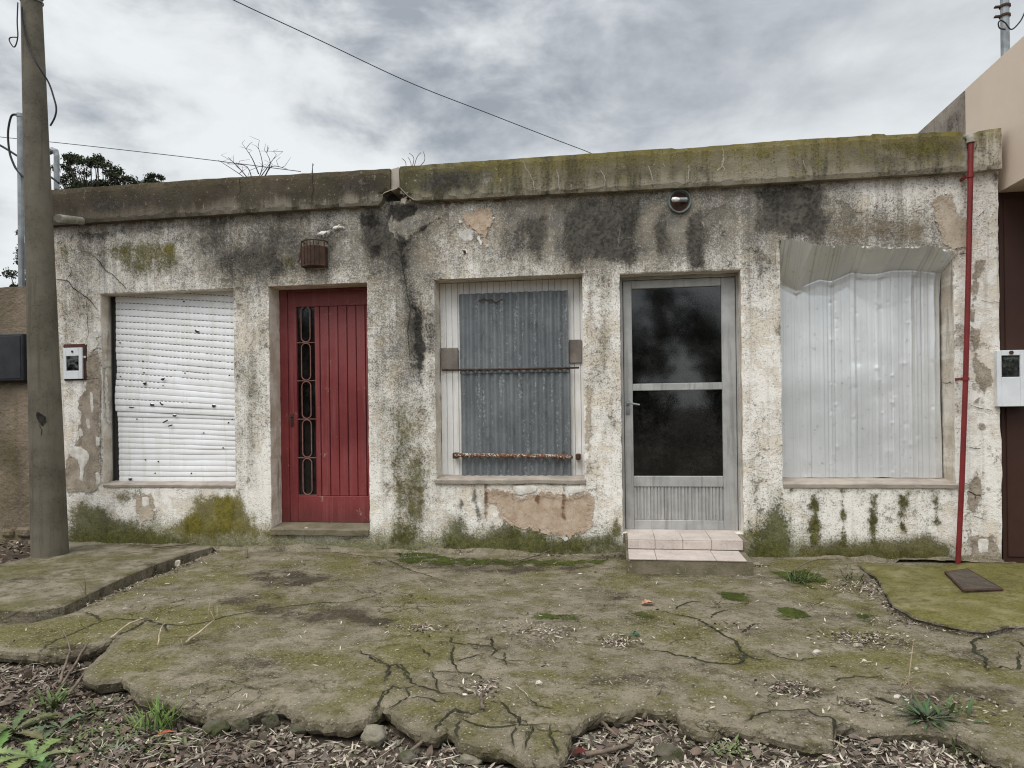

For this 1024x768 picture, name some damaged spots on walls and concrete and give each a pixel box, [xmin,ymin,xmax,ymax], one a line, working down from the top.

leakage [61,214,343,281]
peeling [459,207,496,248]
leakage [652,212,670,255]
leakage [685,209,708,269]
peeling [930,191,967,258]
leakage [357,203,437,385]
peeling [970,259,993,403]
peeling [65,330,113,495]
leakage [213,496,234,534]
peeling [484,485,597,541]
leakage [807,489,879,557]
leakage [892,490,942,532]